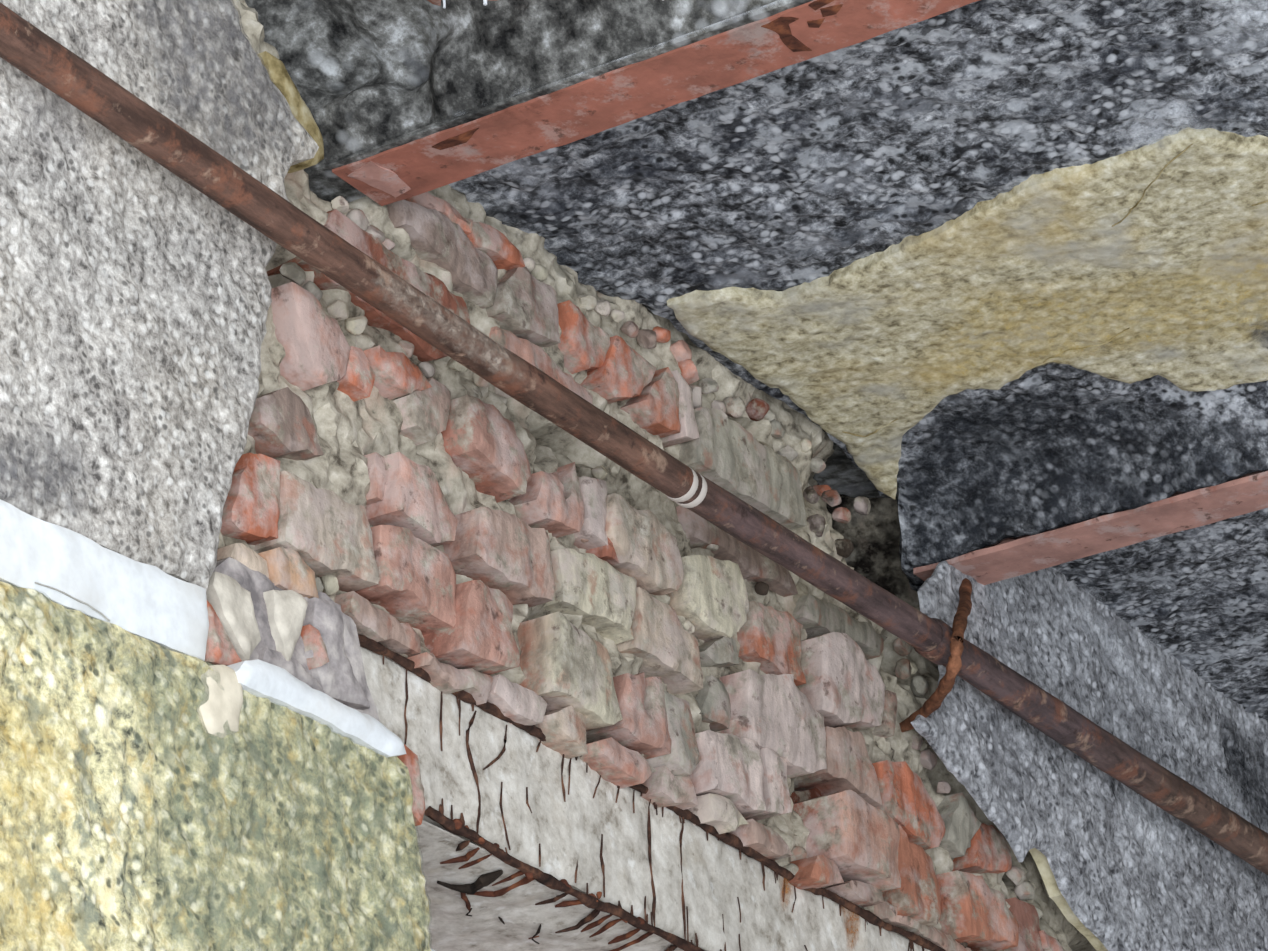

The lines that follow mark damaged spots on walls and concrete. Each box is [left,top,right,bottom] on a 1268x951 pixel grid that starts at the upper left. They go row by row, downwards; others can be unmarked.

crack [1112,143,1194,227]
flaking render [233,0,1268,611]
crack [35,582,110,622]
flaking render [205,244,1108,951]
rust [842,906,859,947]